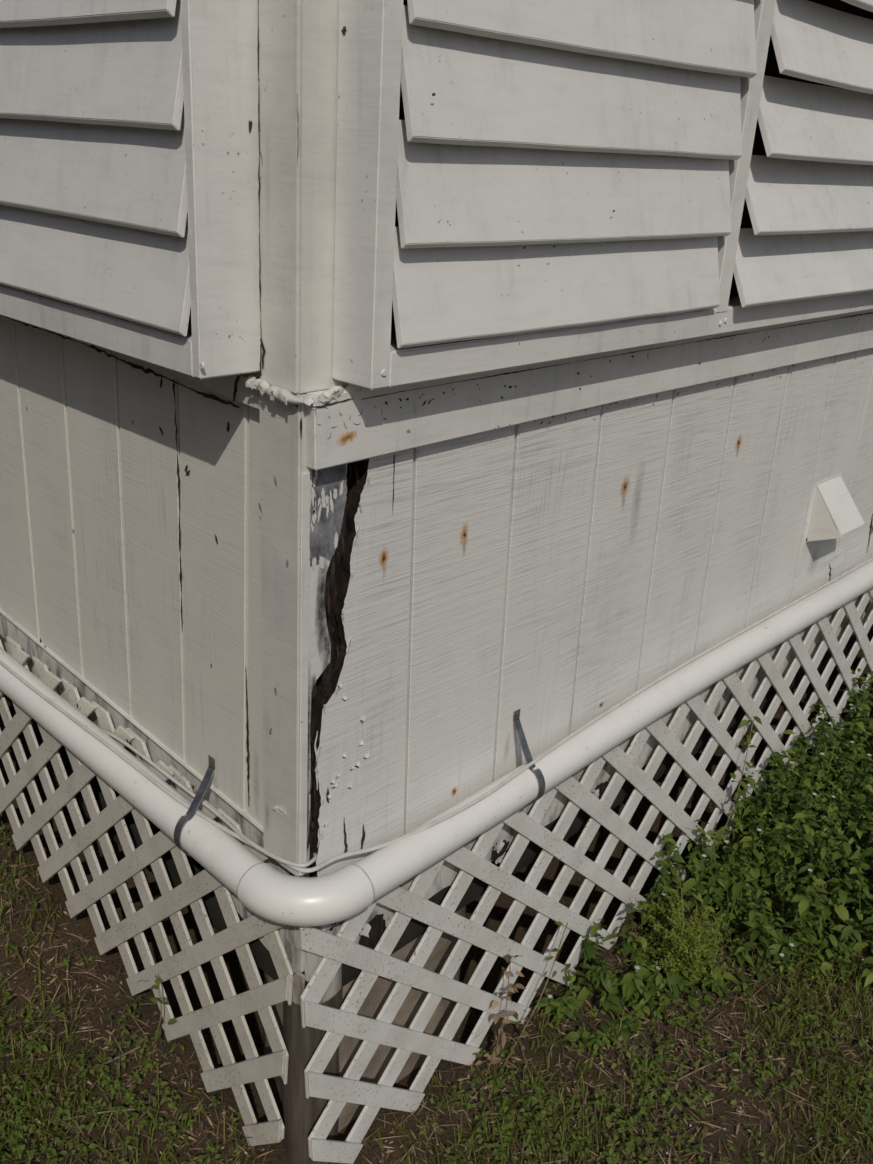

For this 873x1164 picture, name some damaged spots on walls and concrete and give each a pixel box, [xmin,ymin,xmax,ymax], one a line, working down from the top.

crack [1,0,266,408]
peeling [309,464,362,570]
crack [344,817,365,853]